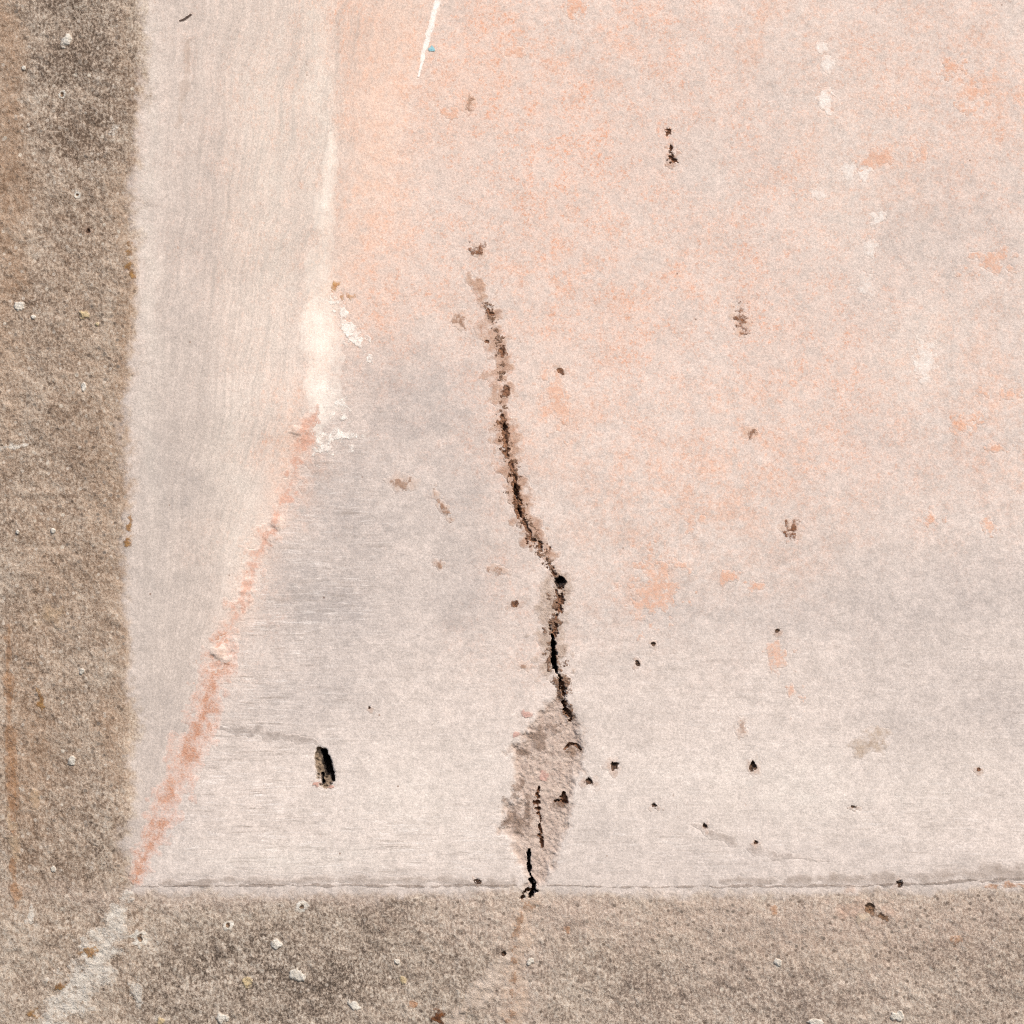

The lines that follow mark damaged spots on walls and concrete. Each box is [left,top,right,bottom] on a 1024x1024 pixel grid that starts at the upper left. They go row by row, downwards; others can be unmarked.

corrosion [128,403,321,888]
spalling [321,749,335,784]
crack [463,270,582,750]